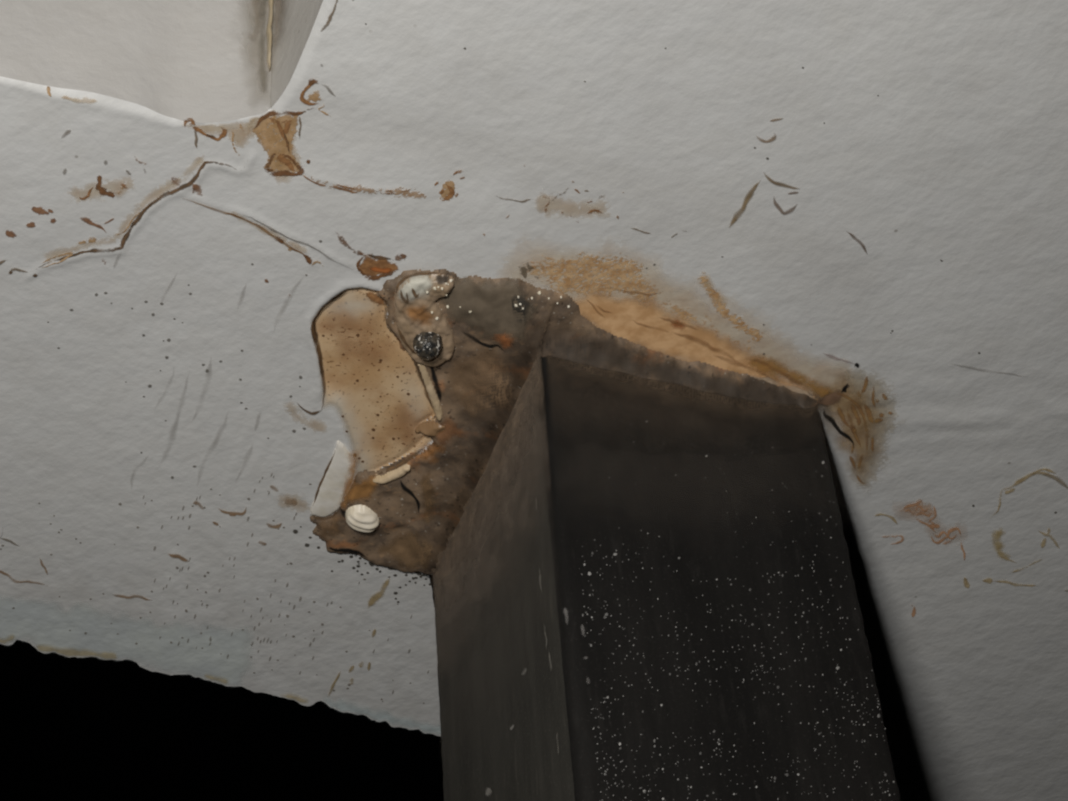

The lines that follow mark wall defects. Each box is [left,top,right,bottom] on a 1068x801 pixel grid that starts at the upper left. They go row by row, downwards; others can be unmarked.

corrosion [184,79,425,198]
crack [0,161,321,277]
corrosion [435,171,464,201]
corrosion [731,183,758,225]
peeling [298,269,819,576]
crack [996,468,1066,513]
corrosion [875,501,965,560]